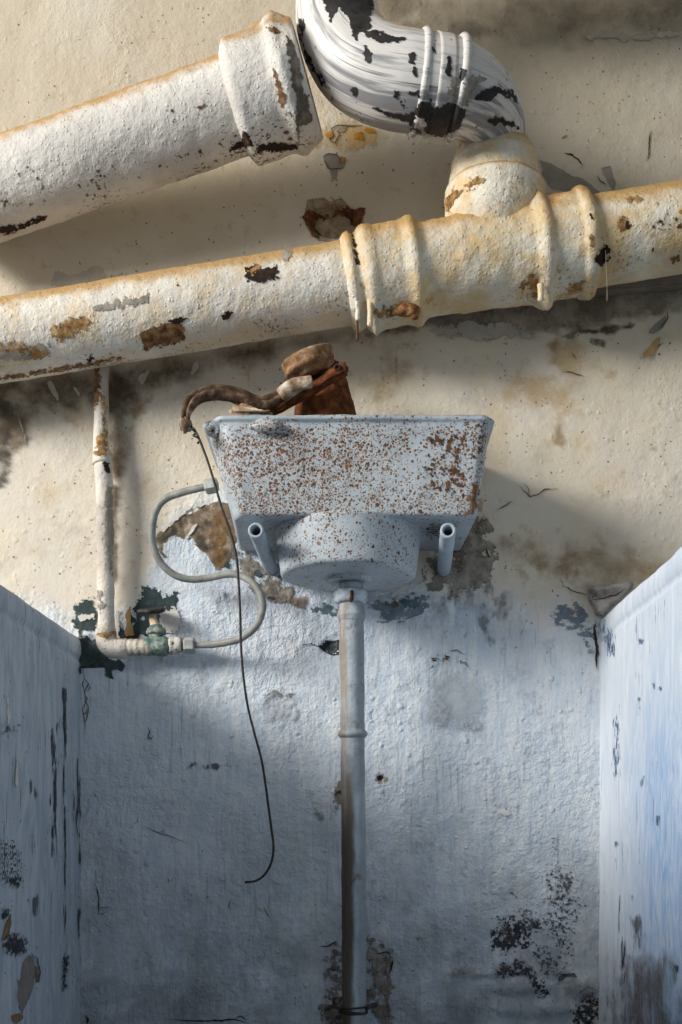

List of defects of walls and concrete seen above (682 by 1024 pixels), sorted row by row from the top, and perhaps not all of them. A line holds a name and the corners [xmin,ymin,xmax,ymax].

spalling [302,197,366,265]
damp [0,399,11,487]
peeling [71,596,125,679]
peeling [114,585,182,639]
peeling [156,501,338,617]
peeling [369,516,507,623]
mould [0,837,27,889]
mould [485,838,586,1000]
peeling [2,907,41,1024]
spalling [317,941,342,1024]
spalling [366,937,395,1024]